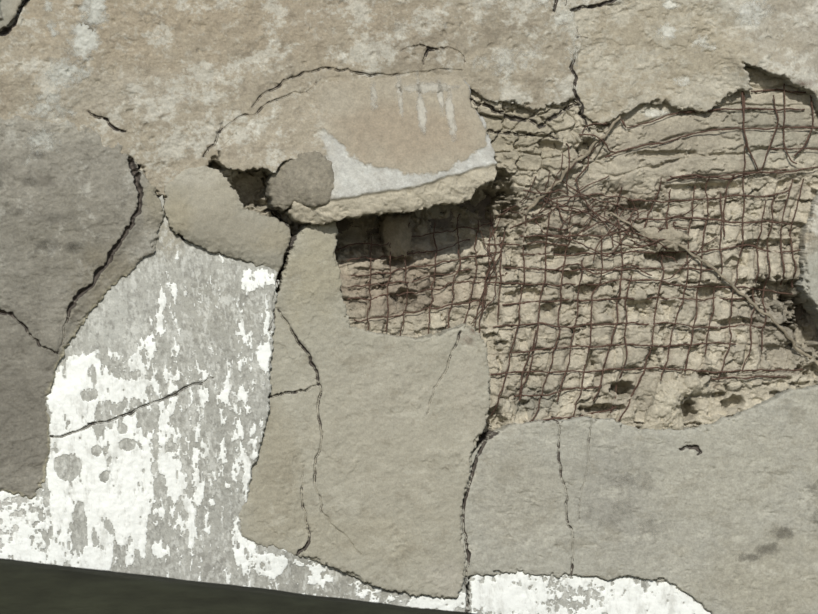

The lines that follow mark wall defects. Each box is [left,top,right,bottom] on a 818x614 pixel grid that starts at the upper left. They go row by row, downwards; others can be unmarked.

crack [0,0,29,36]
crack [470,0,617,139]
crack [0,158,143,354]
crack [50,377,213,438]
crack [264,207,323,556]
peeling [67,501,88,557]
crack [462,430,499,612]
peeling [249,550,288,582]
peeling [306,562,334,588]
peeling [354,581,382,603]
peeling [406,576,469,611]
peeling [454,570,711,614]